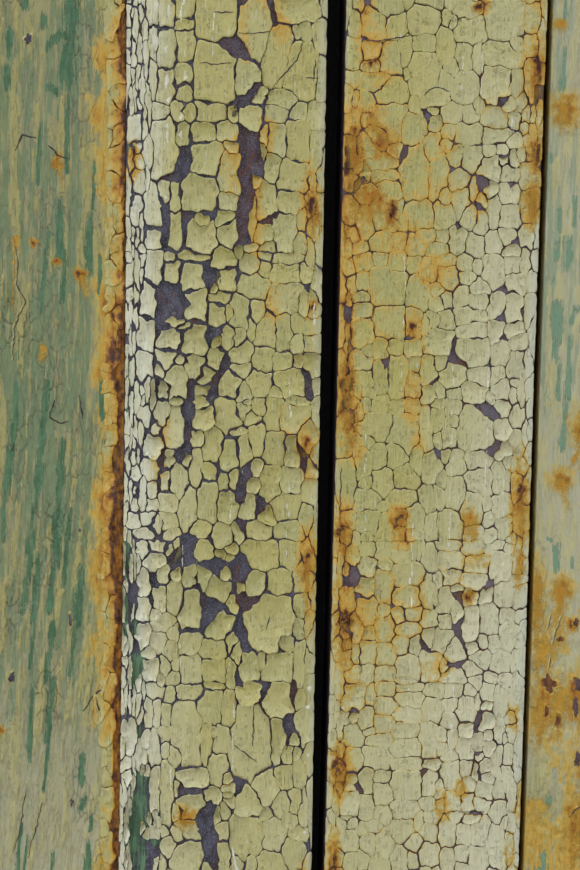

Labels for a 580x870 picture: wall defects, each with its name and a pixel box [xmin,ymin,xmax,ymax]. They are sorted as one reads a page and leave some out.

corrosion [343,117,398,243]
peeling [140,82,277,468]
peeling [273,353,321,418]
crack [119,0,562,870]
corrosion [338,327,358,452]
peeling [136,458,277,653]
corrosion [514,550,525,589]
corrosion [532,575,576,669]
crack [83,689,101,717]
peeling [226,657,312,766]
corrosion [530,679,580,745]
peeling [170,769,231,870]